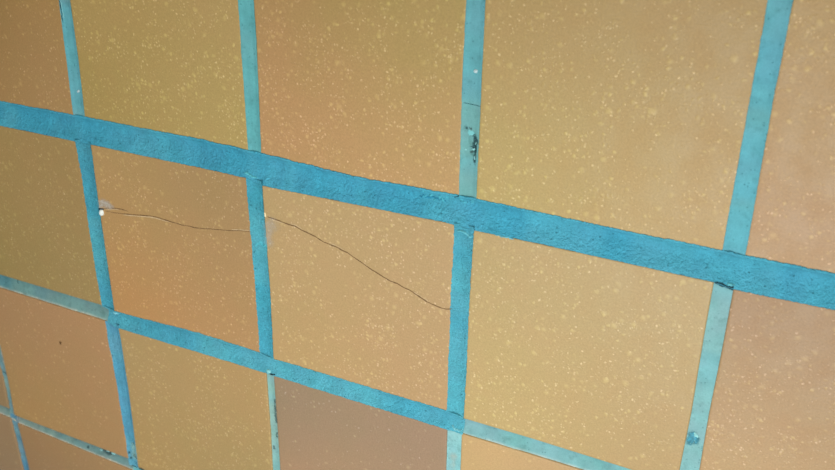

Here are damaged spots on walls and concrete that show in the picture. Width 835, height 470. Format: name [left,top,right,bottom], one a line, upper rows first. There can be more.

crack [102,208,250,232]
crack [268,217,452,310]